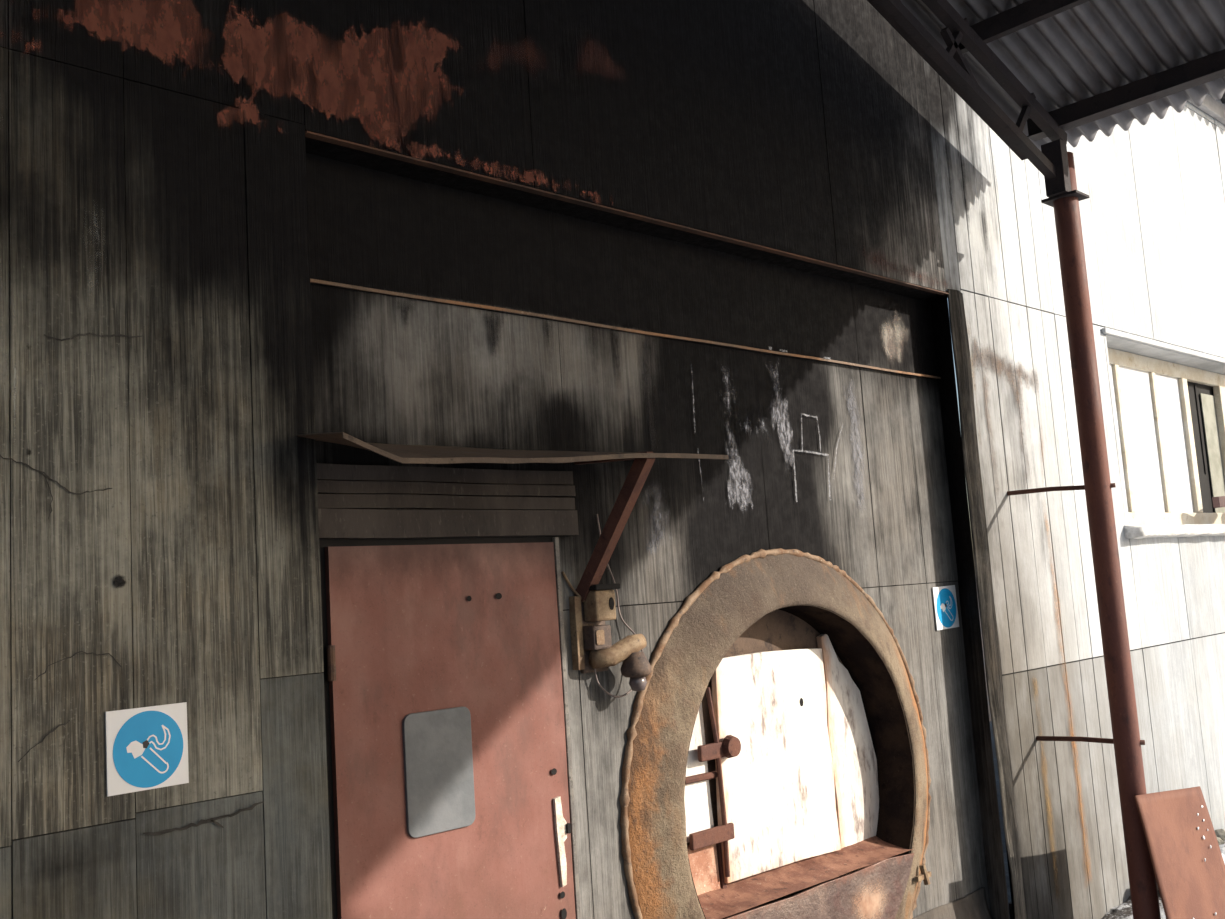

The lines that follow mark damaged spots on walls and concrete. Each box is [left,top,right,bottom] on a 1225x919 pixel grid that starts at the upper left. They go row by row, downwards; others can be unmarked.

corrosion [369,126,613,205]
damp [848,388,864,505]
crack [0,455,112,519]
crack [143,801,264,835]